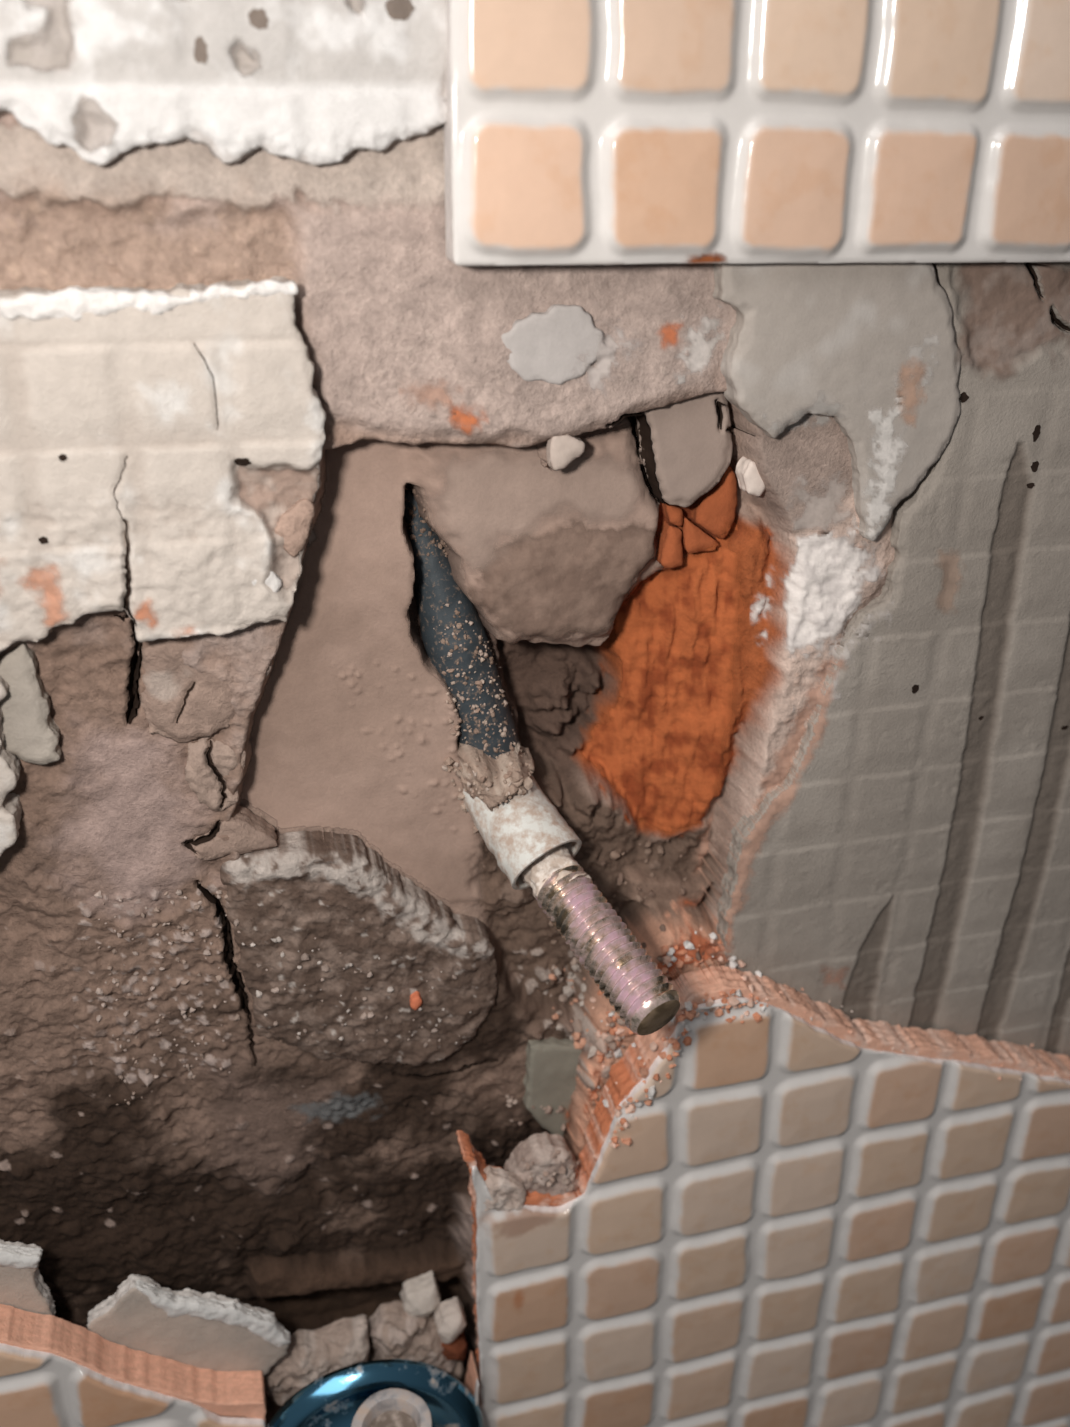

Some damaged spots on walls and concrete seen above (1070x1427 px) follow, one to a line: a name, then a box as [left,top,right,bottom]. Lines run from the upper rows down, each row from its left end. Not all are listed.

peeling [7,0,73,71]
peeling [345,0,364,13]
peeling [72,97,117,151]
crack [1025,262,1070,331]
crack [607,412,665,504]
flaking render [735,456,765,497]
crack [113,456,141,724]
crack [176,682,195,723]
spalling [237,434,659,903]
flaking render [579,522,747,836]
crack [184,740,256,1066]